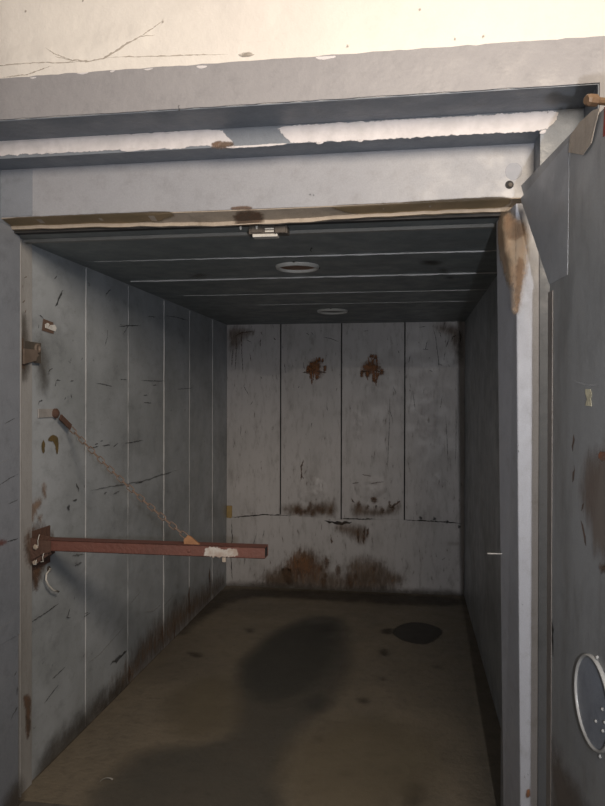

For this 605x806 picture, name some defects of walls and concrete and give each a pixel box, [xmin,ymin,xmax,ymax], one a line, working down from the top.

crack [0,21,220,77]
peeling [0,111,559,156]
corrosion [303,357,326,384]
corrosion [360,354,384,384]
corrosion [285,502,334,516]
corrosion [351,497,400,515]
corrosion [267,552,401,591]